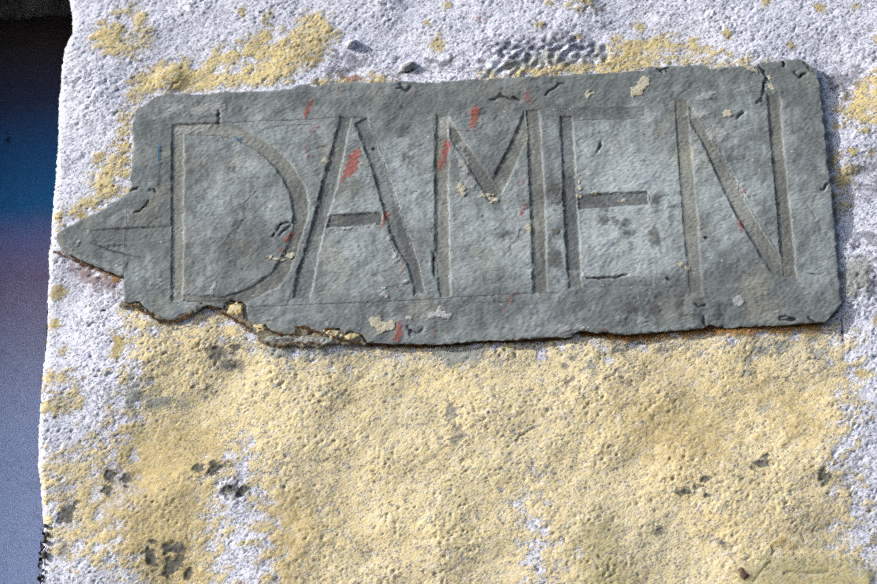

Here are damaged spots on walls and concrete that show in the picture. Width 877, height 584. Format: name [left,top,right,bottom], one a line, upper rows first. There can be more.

flaking render [843,253,877,301]
flaking render [119,301,368,362]
flaking render [422,344,489,369]
flaking render [124,378,189,412]
peeling [100,469,133,498]
peeling [191,459,231,476]
peeling [221,483,246,503]
peeling [674,475,711,498]
peeling [750,453,773,471]
peeling [818,469,831,486]
spalling [37,500,80,583]
peeling [142,539,194,580]